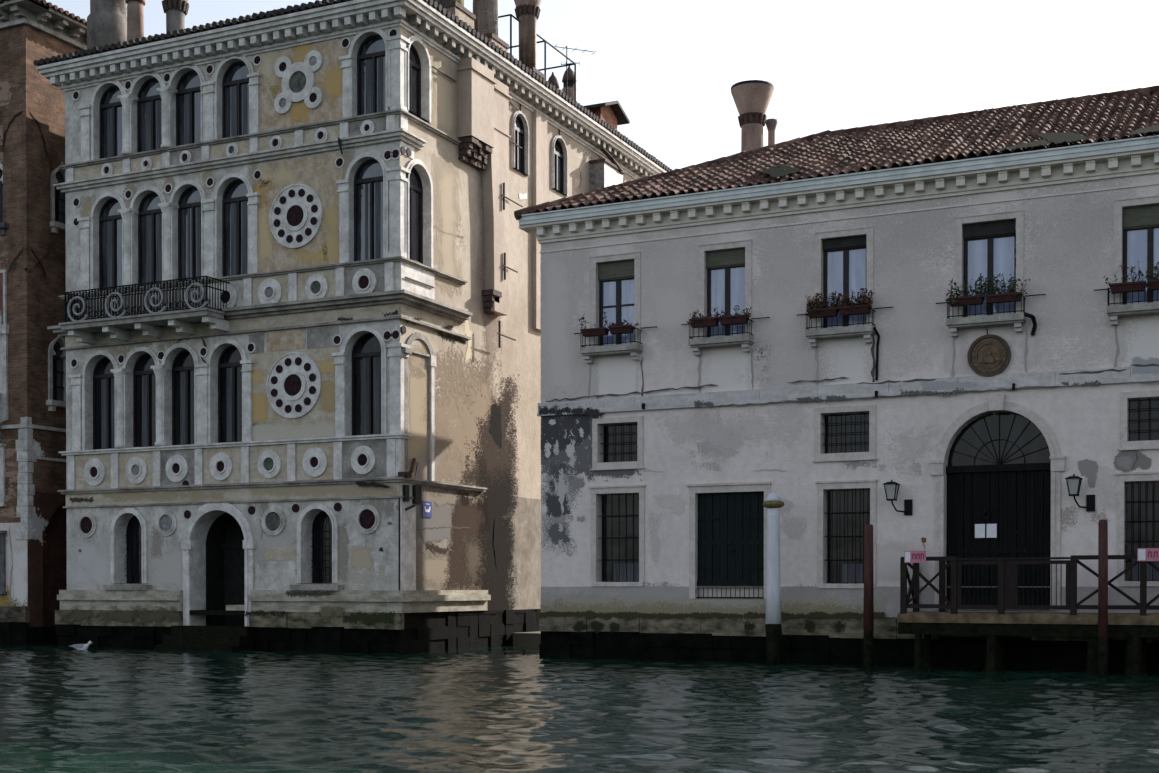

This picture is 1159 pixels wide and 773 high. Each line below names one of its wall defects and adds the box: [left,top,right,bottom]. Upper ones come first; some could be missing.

damp [632,176,1159,393]
damp [408,56,520,611]
spalling [489,404,502,448]
spalling [0,438,49,545]
peeling [544,419,591,545]
peeling [1077,459,1098,487]
peeling [1113,450,1151,472]
damp [876,540,935,585]
damp [626,582,756,608]
damp [781,584,827,607]